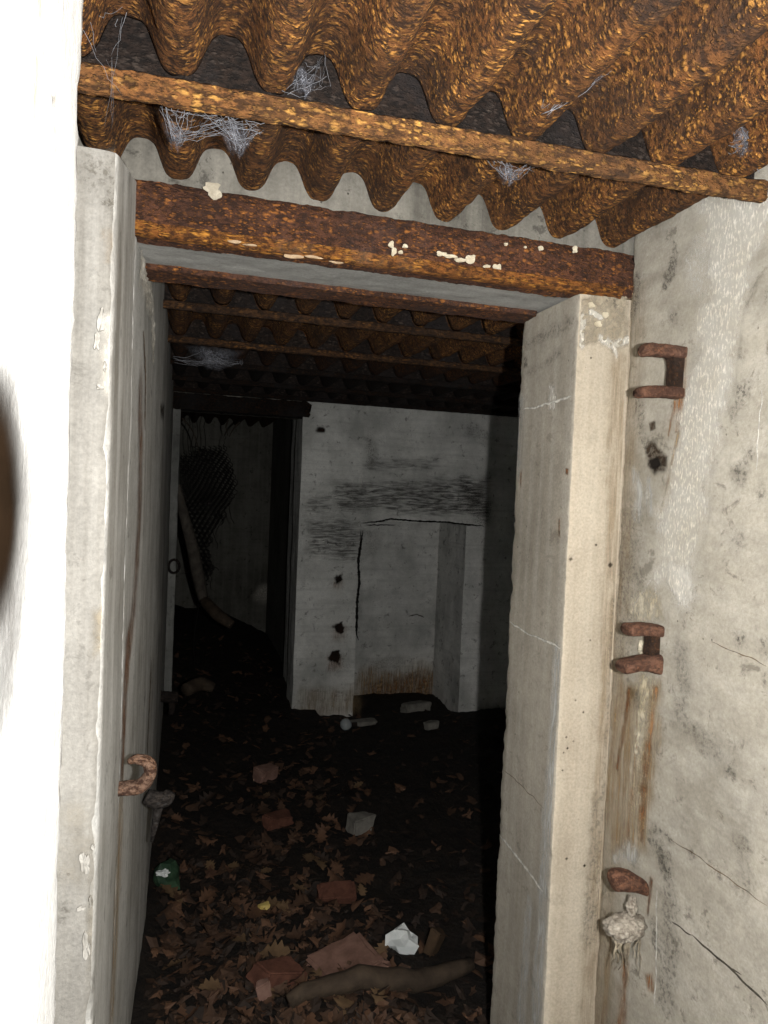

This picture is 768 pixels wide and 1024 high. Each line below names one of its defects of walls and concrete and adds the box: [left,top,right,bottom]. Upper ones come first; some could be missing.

crack [355,518,482,640]
corrosion [607,674,660,861]
crack [671,840,767,906]
crack [654,899,767,1008]